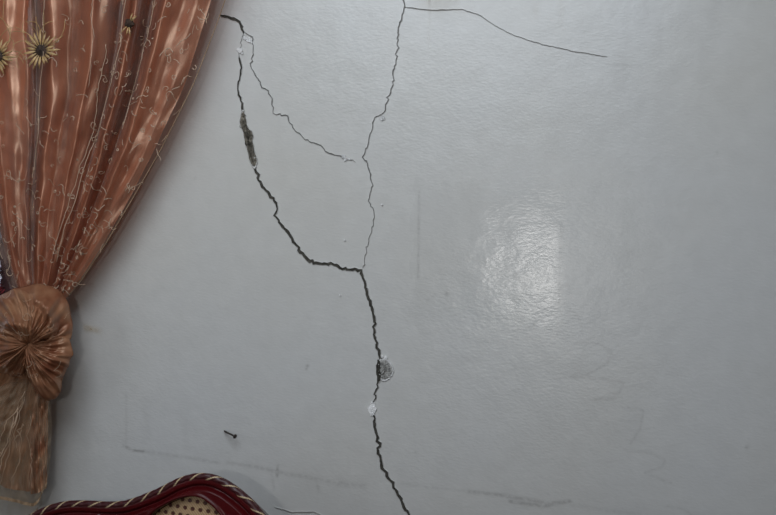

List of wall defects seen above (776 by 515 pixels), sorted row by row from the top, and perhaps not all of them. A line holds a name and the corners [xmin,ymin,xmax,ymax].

crack [220,0,600,515]